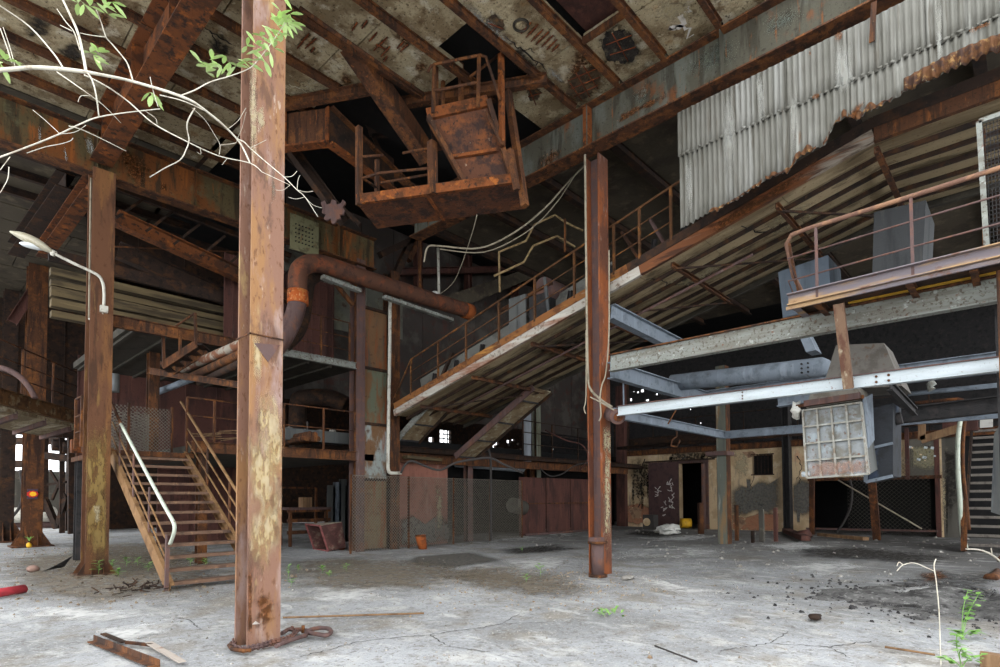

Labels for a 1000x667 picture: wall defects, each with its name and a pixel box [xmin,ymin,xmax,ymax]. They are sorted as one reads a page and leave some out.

spalling [566,26,639,105]
corrosion [709,72,942,212]
water stain [732,454,779,531]
corrosion [248,576,272,630]
water stain [299,533,582,602]